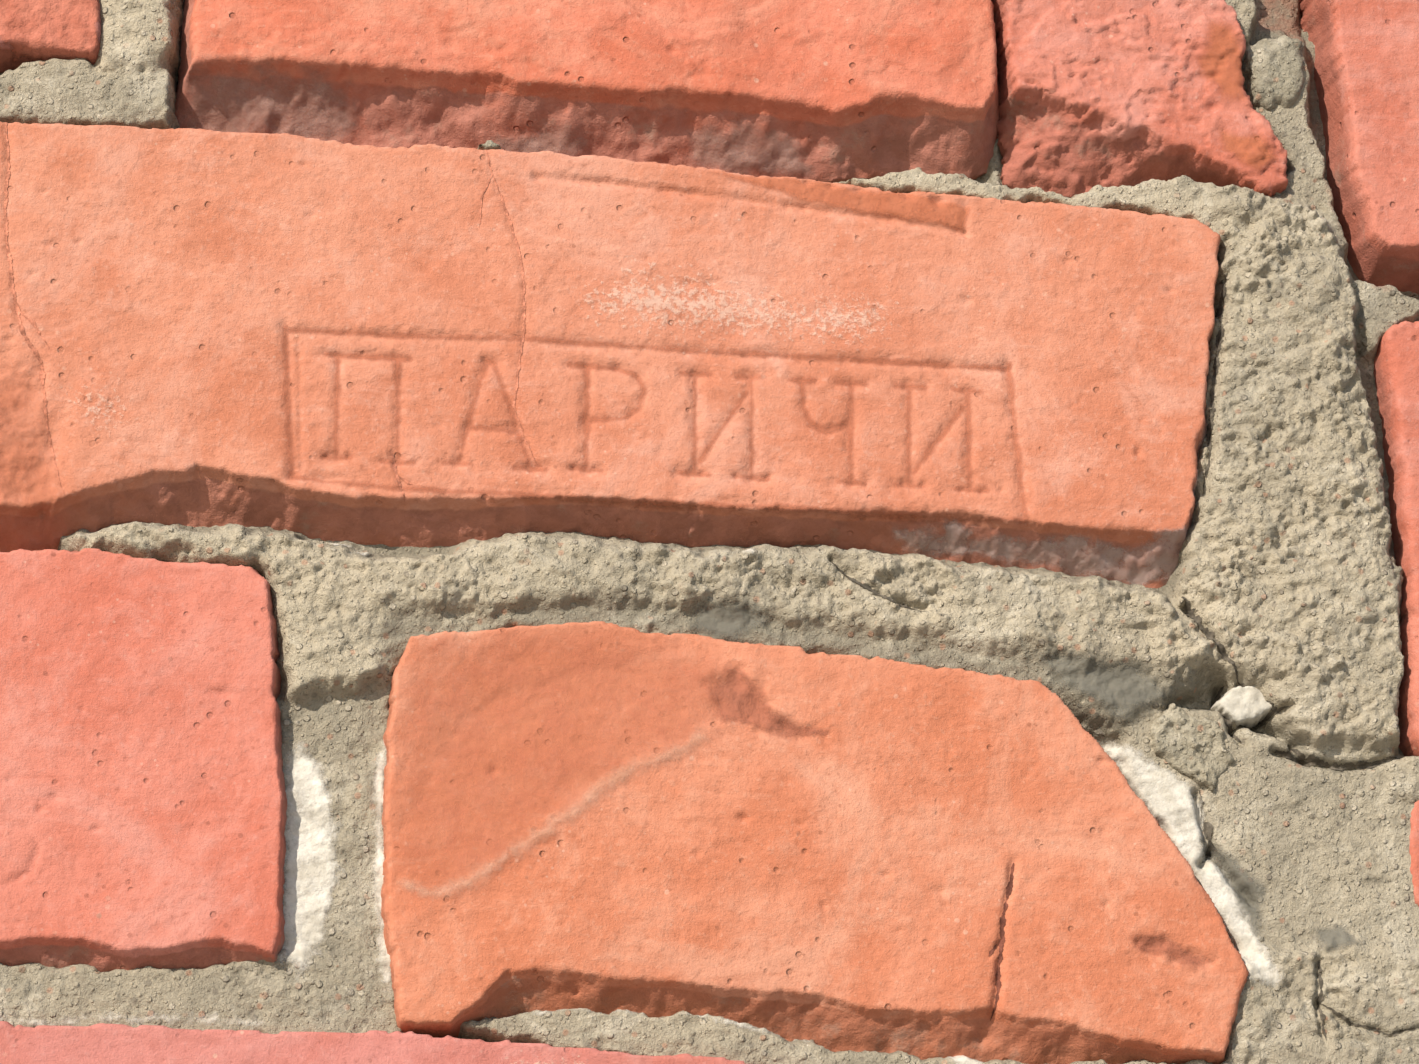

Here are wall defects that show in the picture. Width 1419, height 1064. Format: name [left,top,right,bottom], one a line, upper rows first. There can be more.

spalling [0,0,100,65]
damp [281,745,336,969]
damp [373,751,391,981]
crack [989,863,1014,1021]
damp [1101,741,1280,984]
damp [1317,927,1353,950]